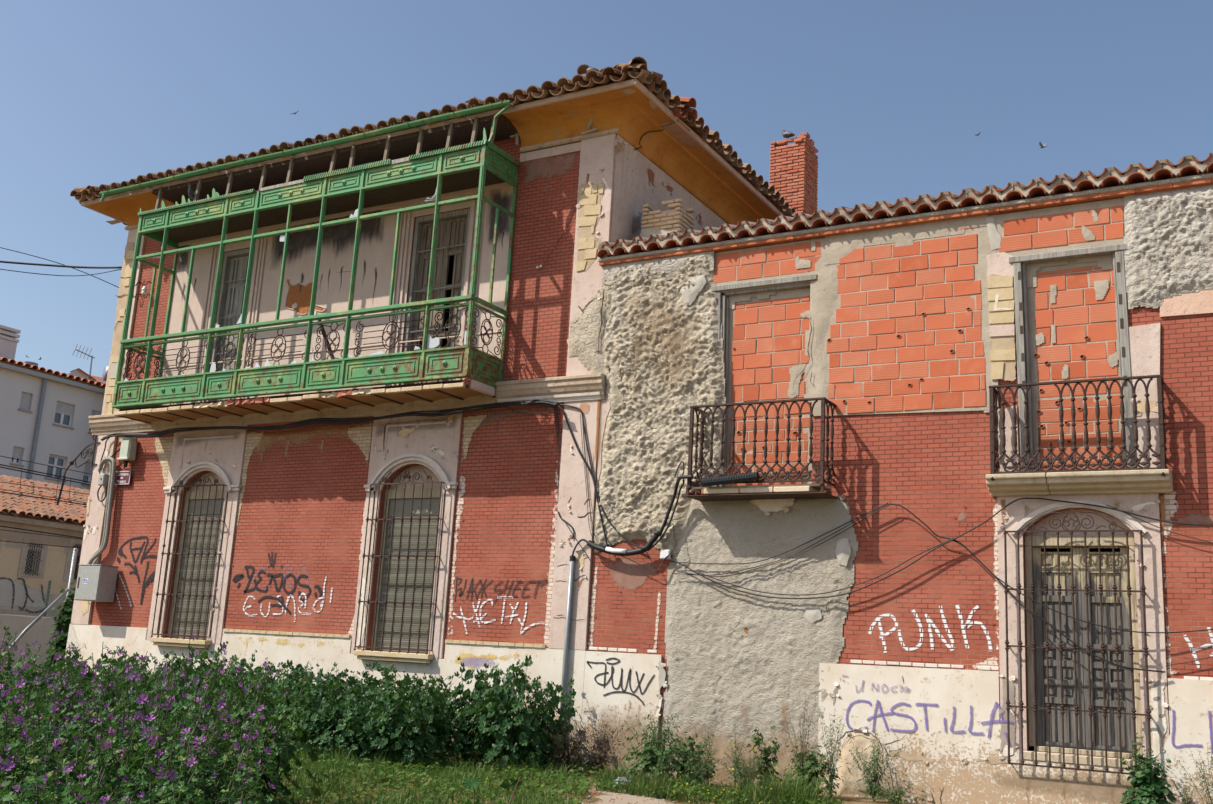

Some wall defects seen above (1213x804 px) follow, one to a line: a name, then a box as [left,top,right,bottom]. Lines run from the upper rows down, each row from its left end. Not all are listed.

damp [274,210,381,260]
peeling [544,445,656,650]
spalling [653,590,668,718]